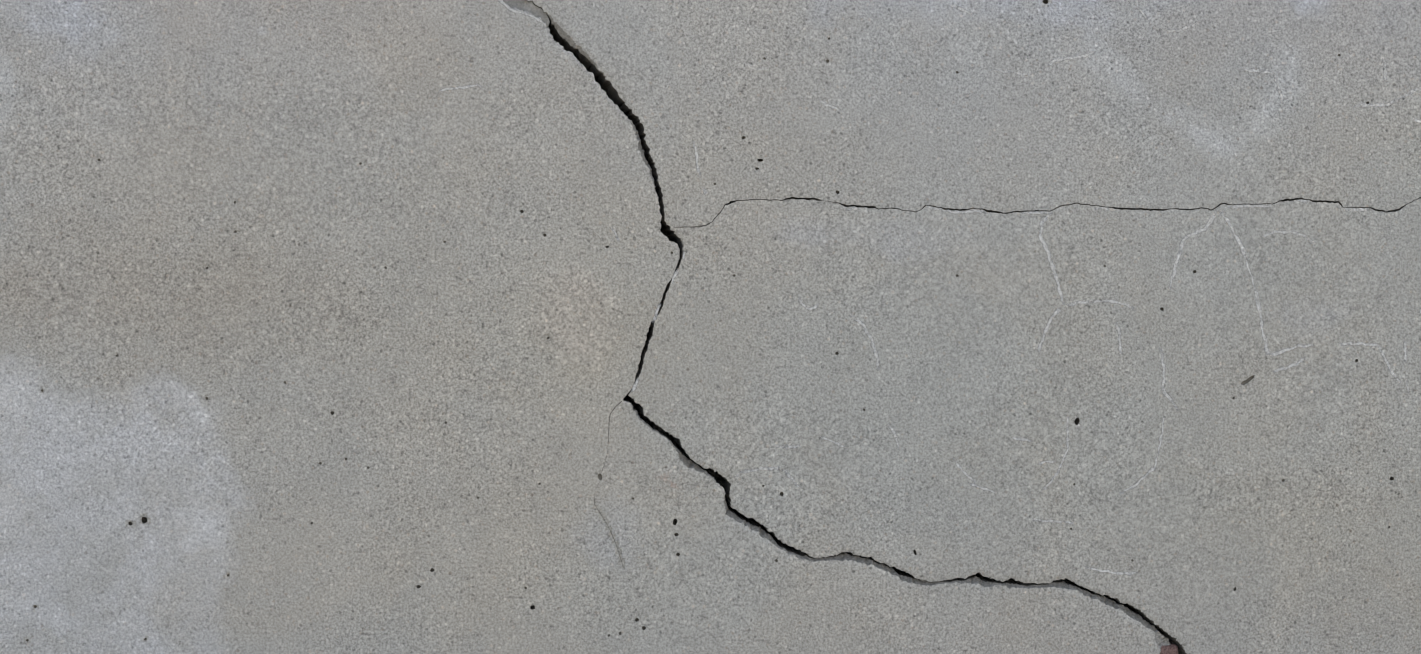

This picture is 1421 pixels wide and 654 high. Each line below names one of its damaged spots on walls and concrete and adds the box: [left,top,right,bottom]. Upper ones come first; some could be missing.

crack [499,0,1421,654]